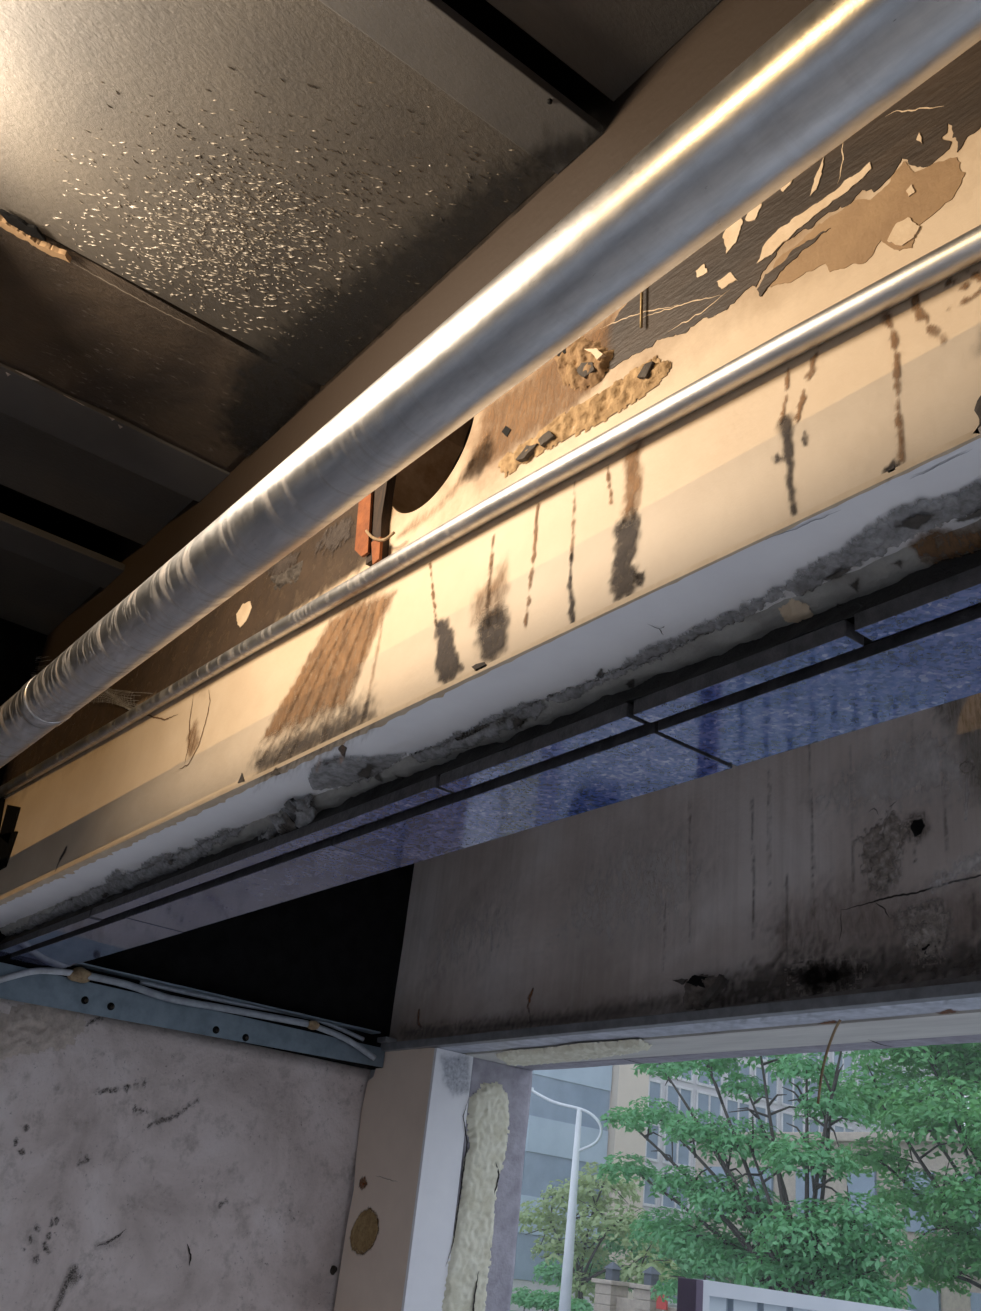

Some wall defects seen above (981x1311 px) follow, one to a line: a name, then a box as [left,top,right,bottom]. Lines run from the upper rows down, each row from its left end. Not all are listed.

peeling [498,40,981,478]
leakage [775,353,817,515]
leakage [883,313,904,473]
leakage [429,562,463,684]
leakage [476,503,539,660]
leakage [567,506,575,623]
leakage [606,444,644,600]
peeling [455,724,488,740]
crack [839,867,981,939]
spalling [673,974,729,1010]